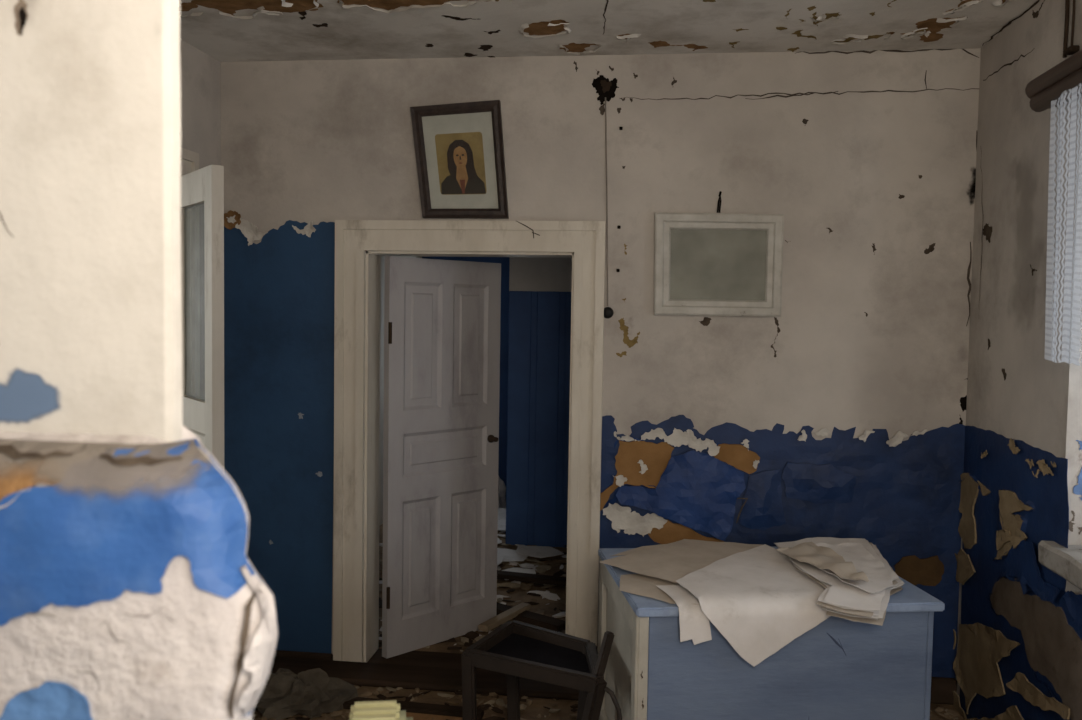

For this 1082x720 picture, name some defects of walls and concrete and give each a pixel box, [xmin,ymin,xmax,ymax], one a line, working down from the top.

flaking render [180,0,328,27]
flaking render [337,0,513,57]
flaking render [518,20,599,55]
flaking render [616,34,708,51]
crack [620,0,1040,100]
flaking render [831,0,1016,45]
peeling [1007,438,1056,478]
peeling [600,428,760,544]
peeling [1073,467,1082,501]
peeling [0,438,274,720]
flaking render [894,473,1082,720]